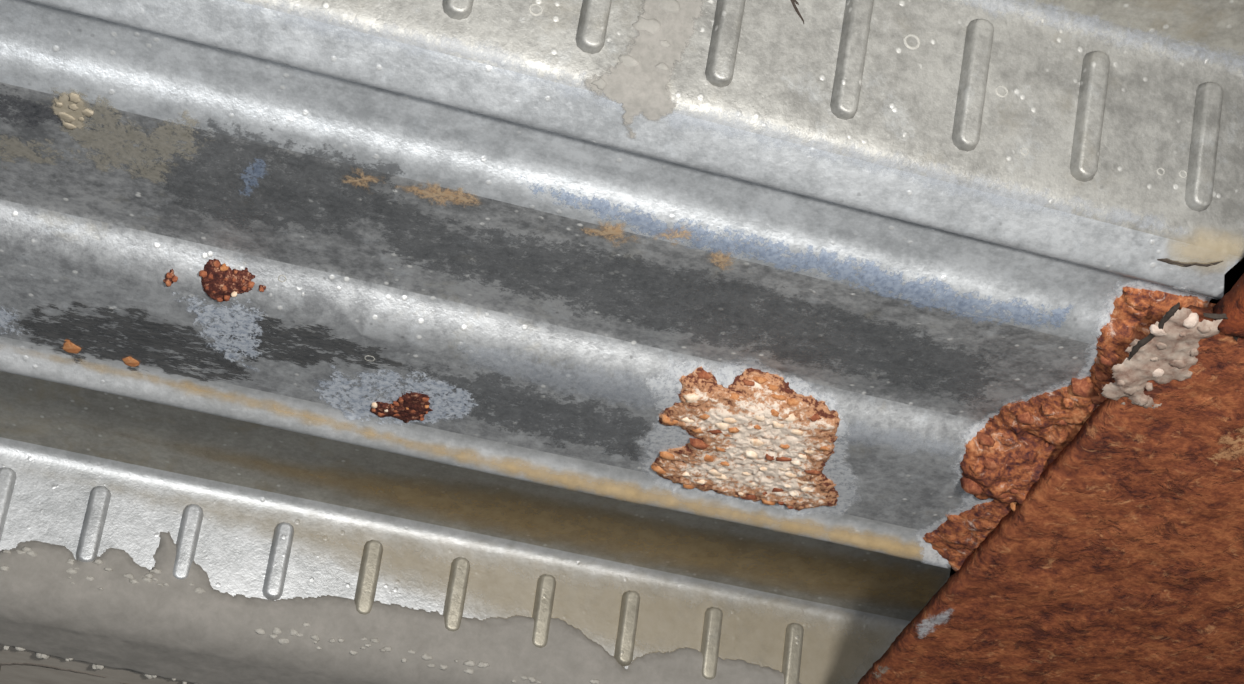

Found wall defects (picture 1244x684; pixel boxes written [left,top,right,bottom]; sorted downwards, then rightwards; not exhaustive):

damp [0,91,1071,406]
rust [163,259,286,369]
damp [0,302,650,461]
rust [273,355,478,445]
rust [433,358,999,569]
peeling [960,431,1033,496]
peeling [1041,378,1107,416]
rust [1010,279,1215,402]
peeling [1100,294,1199,406]
peeling [1183,313,1211,334]
rust [1209,428,1244,464]
damp [0,531,784,684]